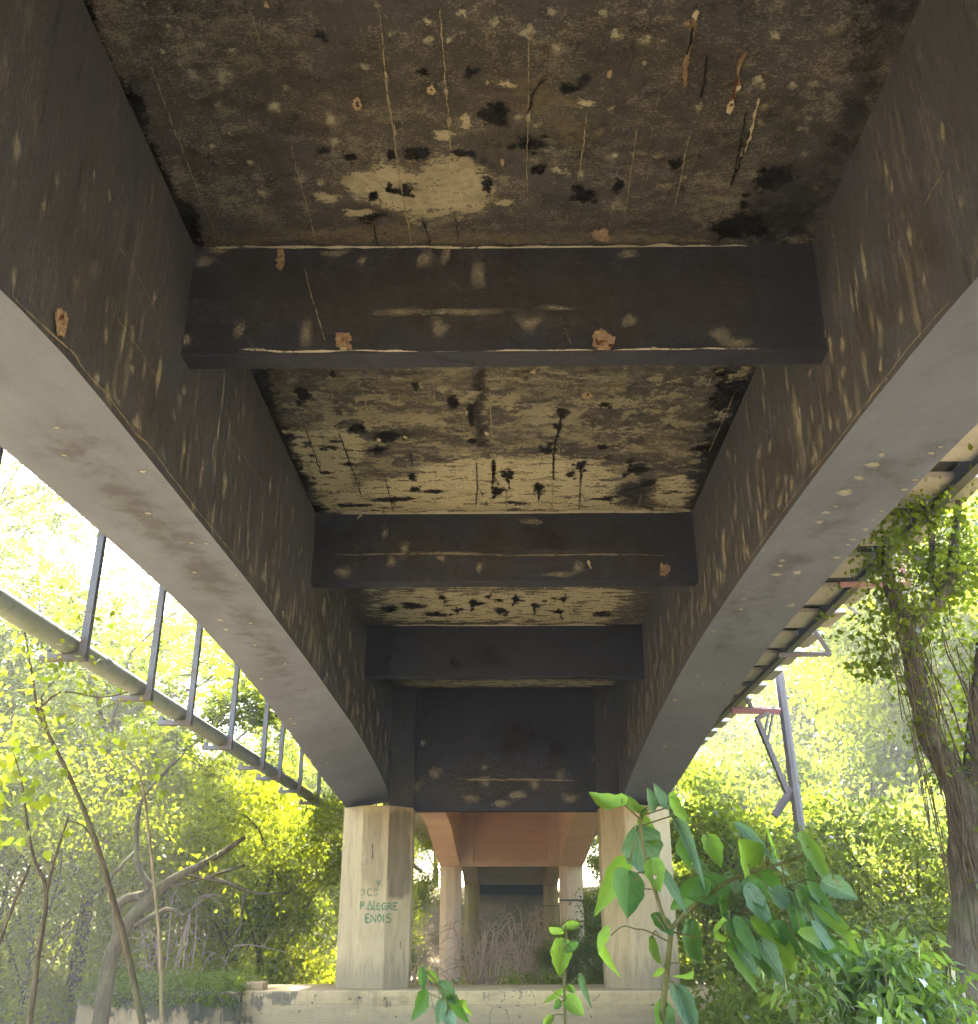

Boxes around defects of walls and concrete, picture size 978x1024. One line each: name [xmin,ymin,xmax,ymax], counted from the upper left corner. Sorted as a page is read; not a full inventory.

damp [151,10,745,265]
crack [730,113,750,188]
spalling [275,249,285,271]
spalling [54,308,69,339]
damp [435,309,501,335]
spalling [334,332,352,350]
spalling [592,328,616,350]
damp [618,328,755,350]
damp [338,456,674,524]
spalling [660,563,671,576]
damp [398,594,607,626]